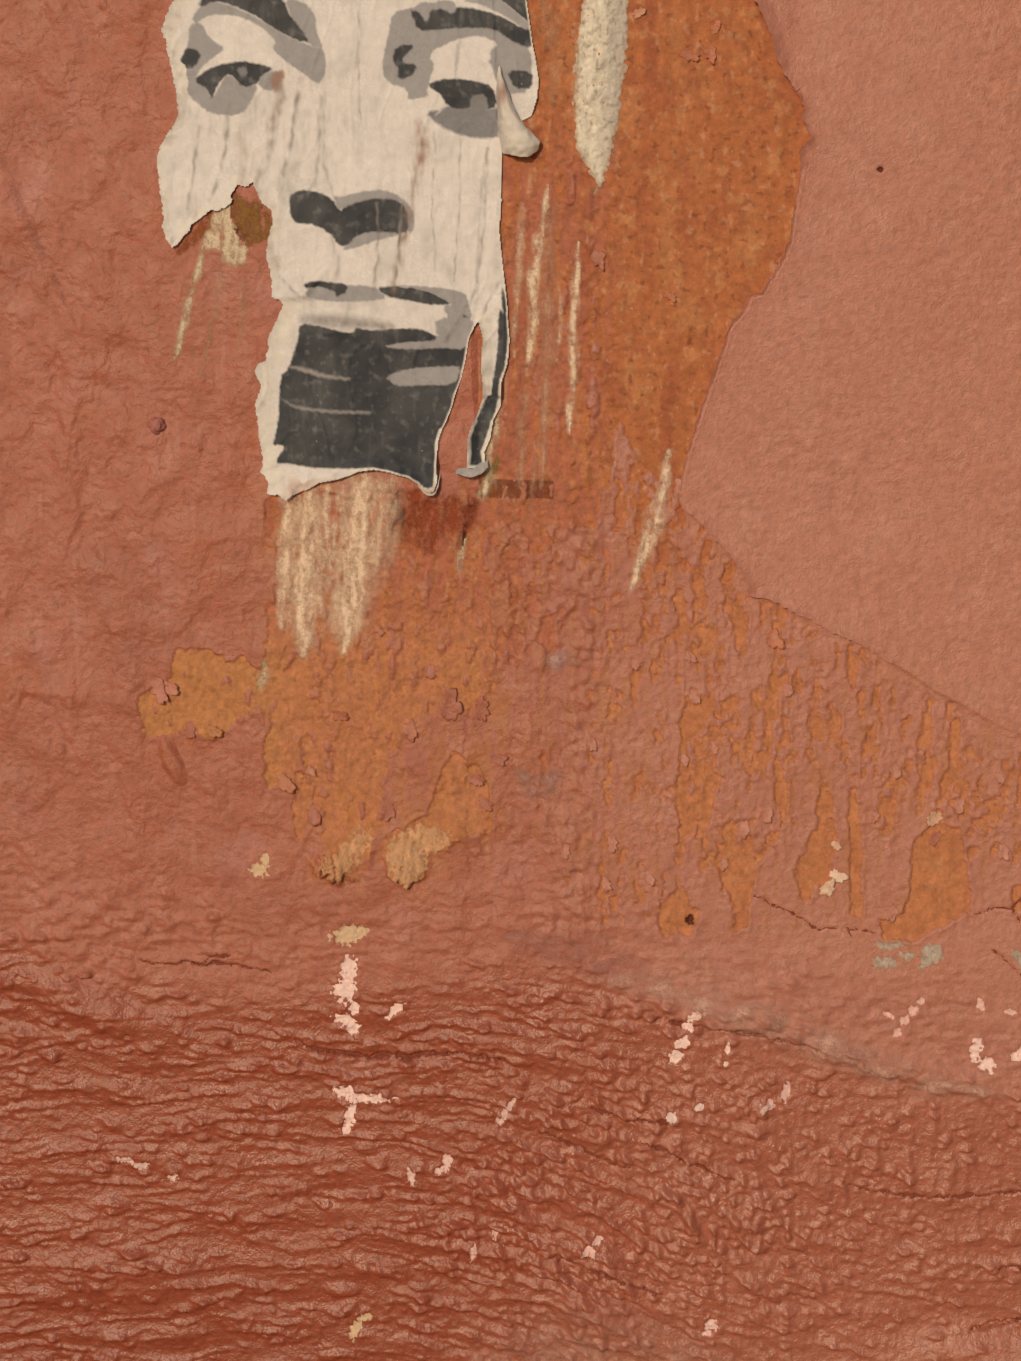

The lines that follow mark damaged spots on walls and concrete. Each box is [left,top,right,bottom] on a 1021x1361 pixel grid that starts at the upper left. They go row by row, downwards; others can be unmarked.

peeling [137,0,1021,972]
crack [753,895,875,937]
crack [139,954,272,973]
peeling [327,923,370,1035]
peeling [385,1002,407,1020]
crack [295,1038,505,1062]
peeling [332,1085,398,1134]
crack [842,1182,1021,1199]